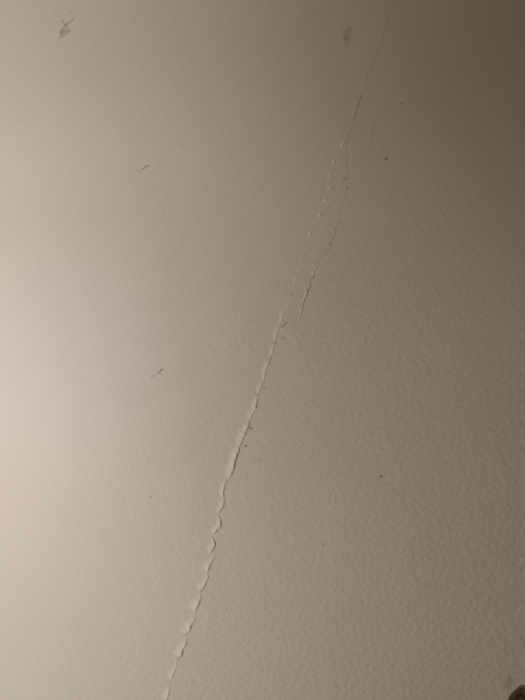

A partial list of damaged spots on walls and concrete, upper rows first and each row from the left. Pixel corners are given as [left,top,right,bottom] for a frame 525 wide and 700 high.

peeling [160,306,285,700]